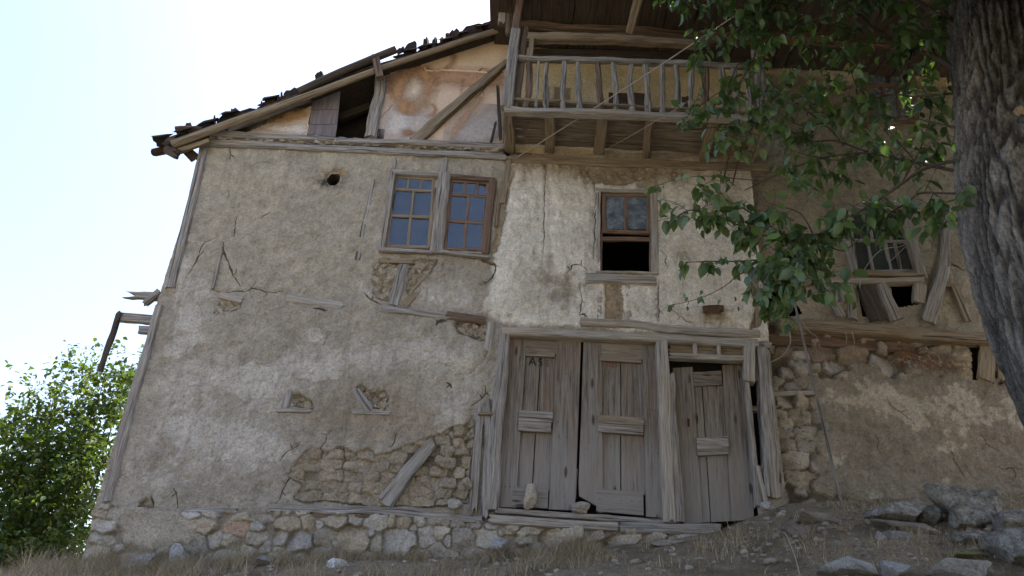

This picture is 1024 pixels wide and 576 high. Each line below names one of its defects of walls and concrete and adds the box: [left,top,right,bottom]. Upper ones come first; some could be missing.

water stain [406,78,423,98]
water stain [385,106,430,138]
crack [188,191,279,313]